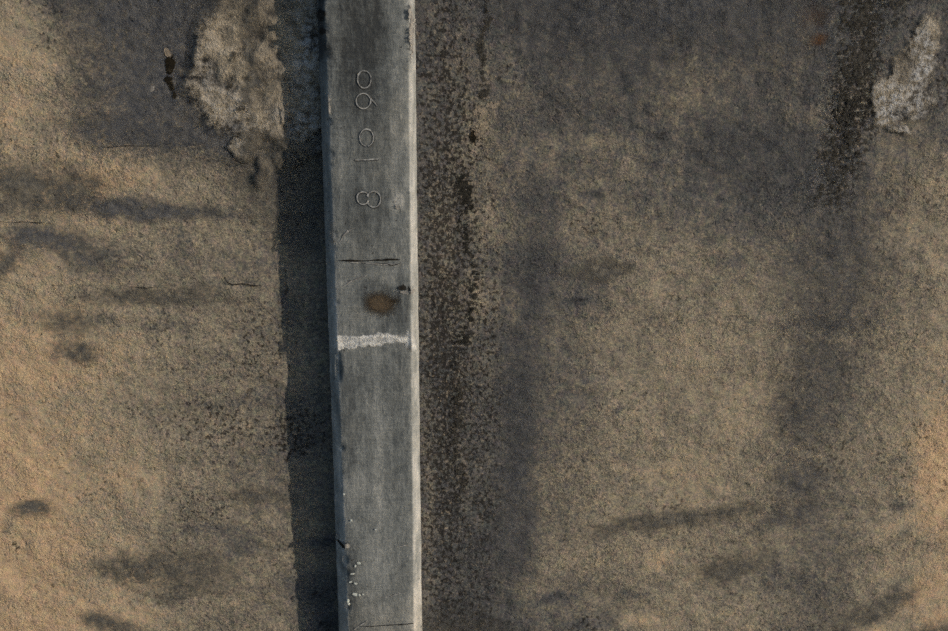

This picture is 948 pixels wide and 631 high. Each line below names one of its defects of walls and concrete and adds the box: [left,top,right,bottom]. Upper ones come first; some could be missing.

leakage [476,0,493,101]
leakage [76,0,323,236]
leakage [814,0,912,209]
leakage [0,168,199,223]
leakage [0,227,101,275]
leakage [106,287,209,304]
leakage [448,173,480,502]